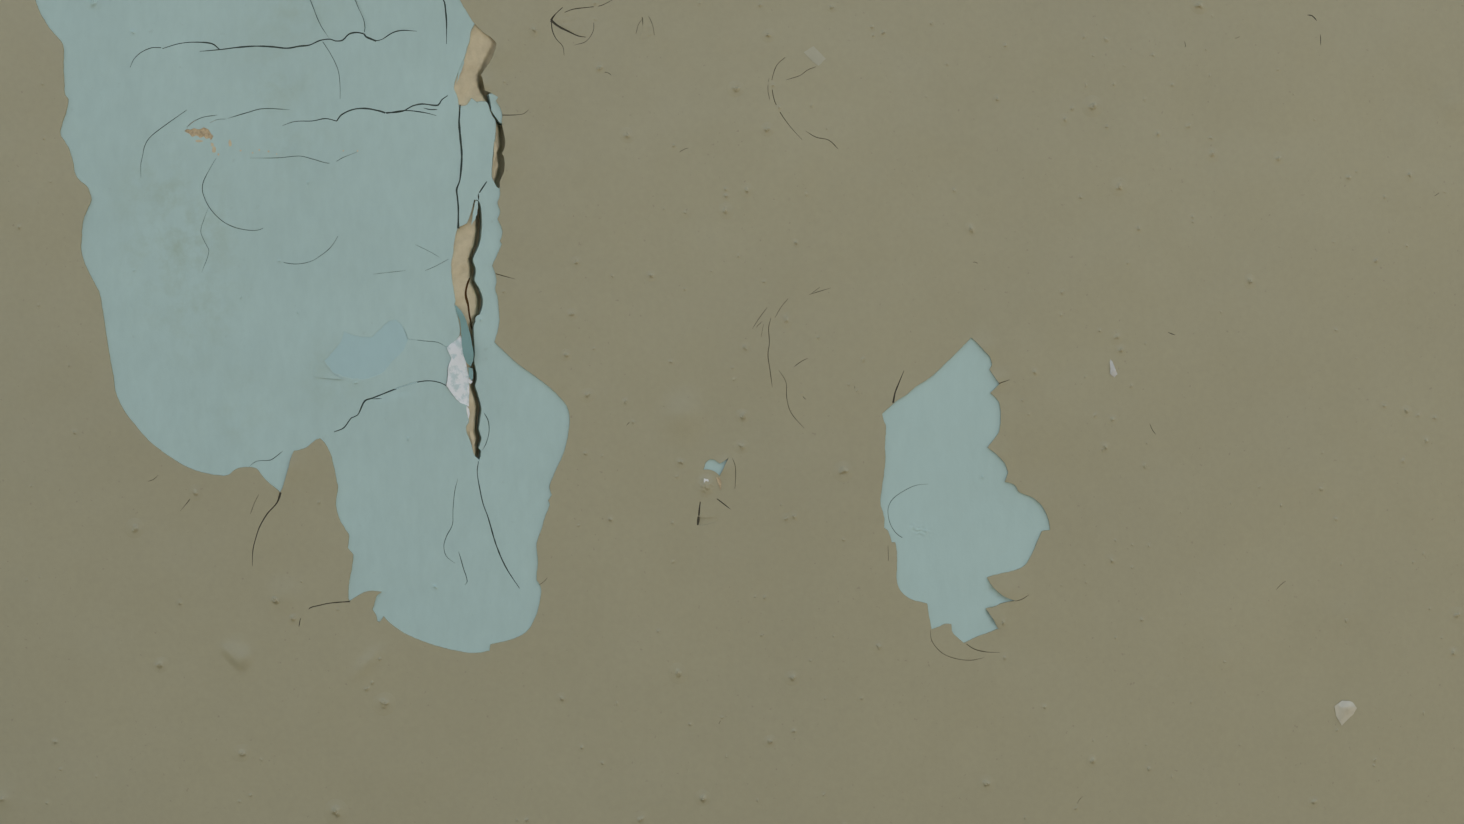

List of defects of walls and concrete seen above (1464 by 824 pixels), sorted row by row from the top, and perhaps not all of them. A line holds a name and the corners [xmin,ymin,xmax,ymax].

crack [130,0,487,274]
peeling [35,0,570,654]
crack [334,380,446,432]
peeling [880,338,1050,643]